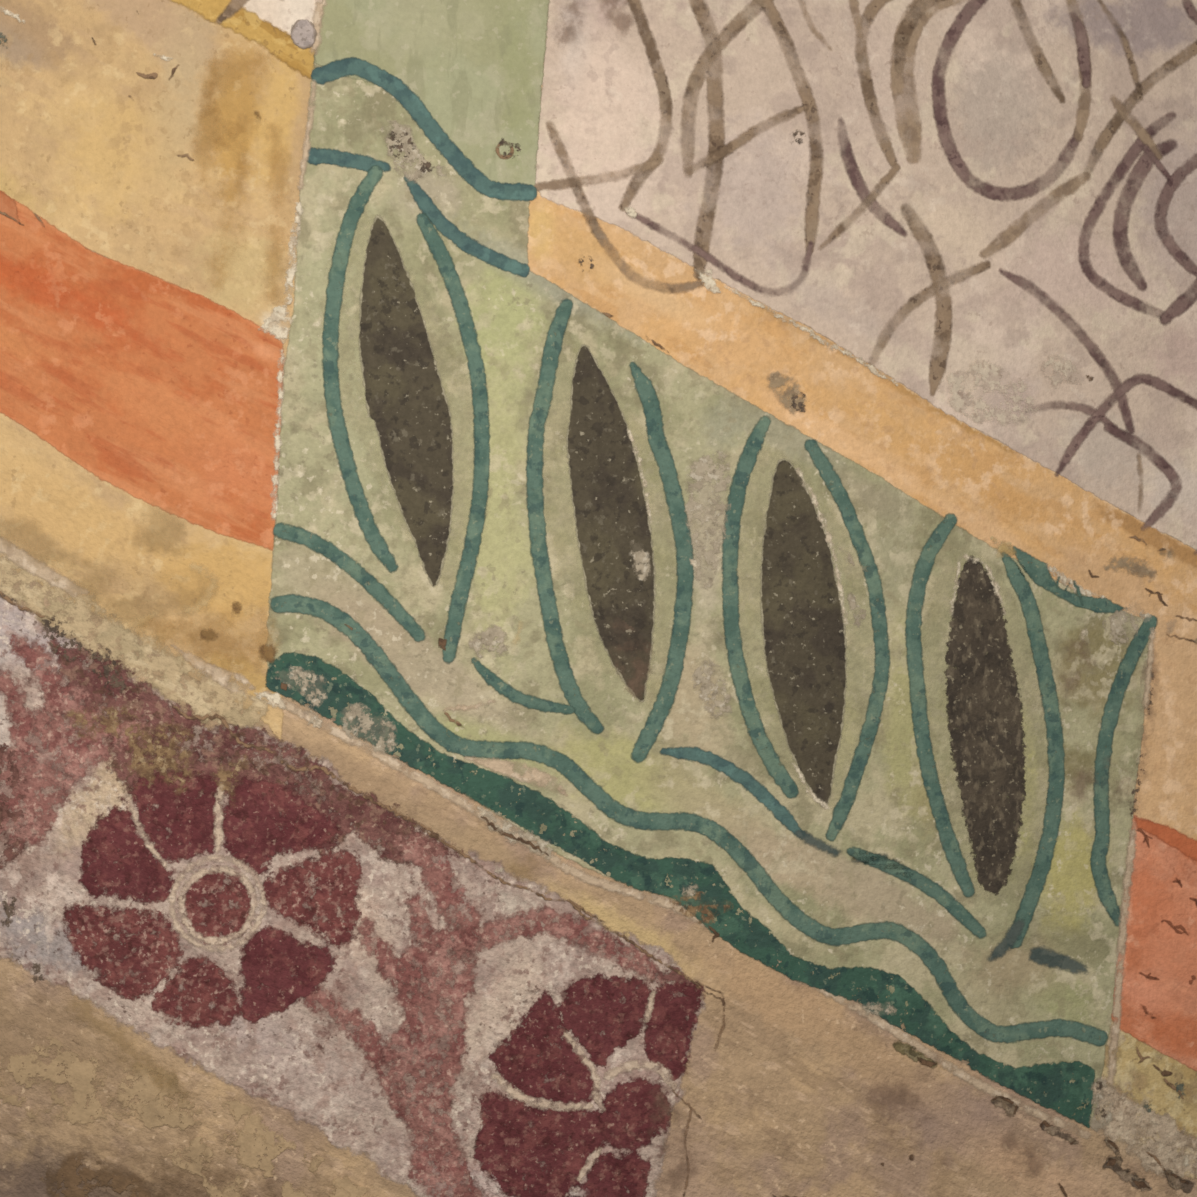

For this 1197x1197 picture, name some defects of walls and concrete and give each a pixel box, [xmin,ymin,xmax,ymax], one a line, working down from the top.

spalling [893,1042,937,1067]
spalling [991,1095,1018,1116]
crack [673,1090,701,1196]
spalling [1040,1121,1079,1144]